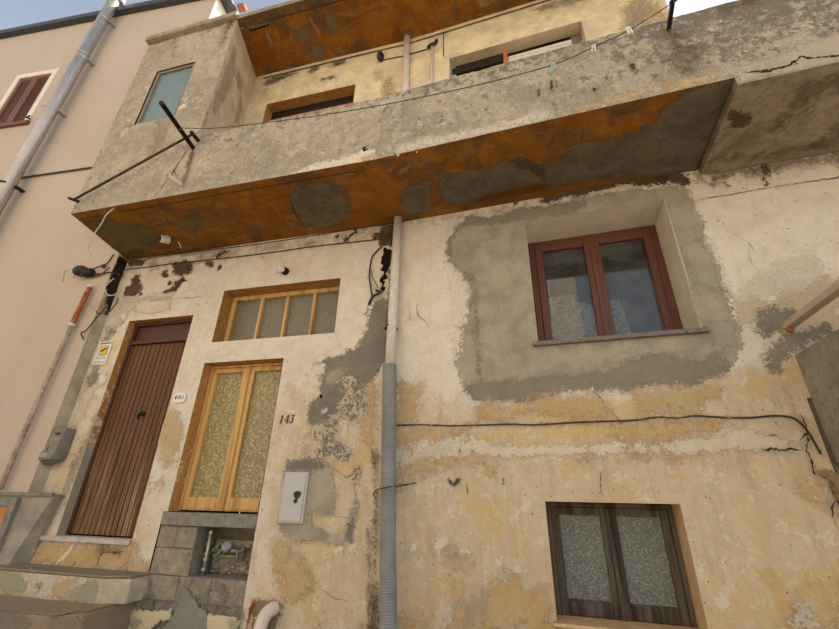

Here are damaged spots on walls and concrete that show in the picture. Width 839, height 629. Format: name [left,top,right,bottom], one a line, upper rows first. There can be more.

crack [742,54,839,73]
water stain [724,109,752,130]
water stain [712,123,839,187]
water stain [536,173,702,205]
peeling [305,345,348,384]
crack [762,415,839,517]
peeling [477,574,555,629]
flaking render [775,599,824,629]